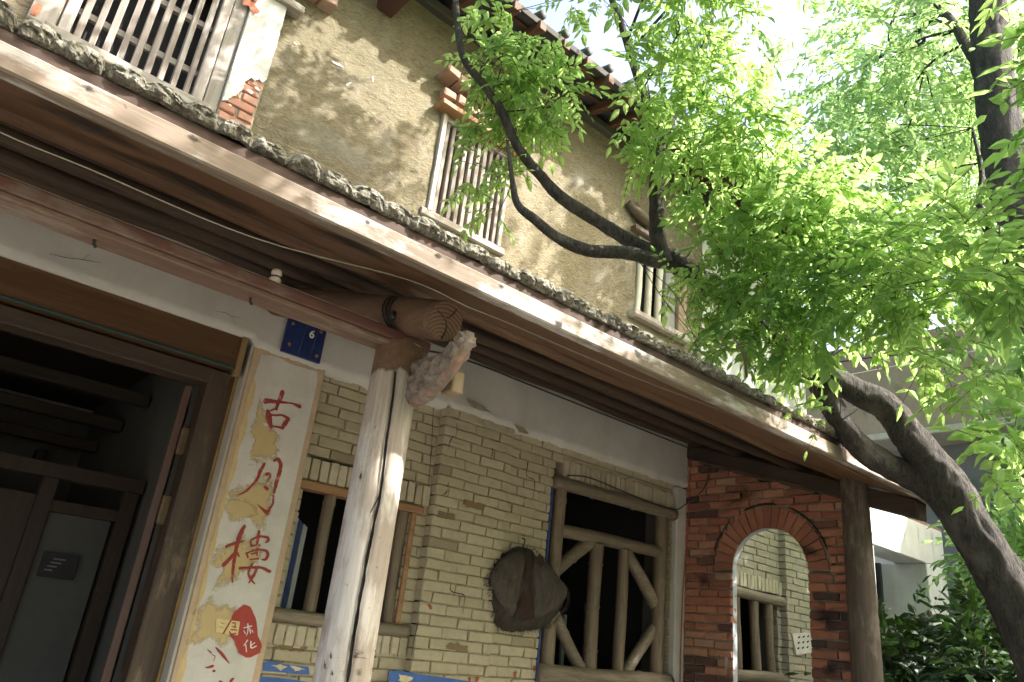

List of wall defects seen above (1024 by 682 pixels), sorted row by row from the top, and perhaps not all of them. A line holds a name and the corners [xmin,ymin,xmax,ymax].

flaking render [215,0,287,130]
crack [346,371,397,682]